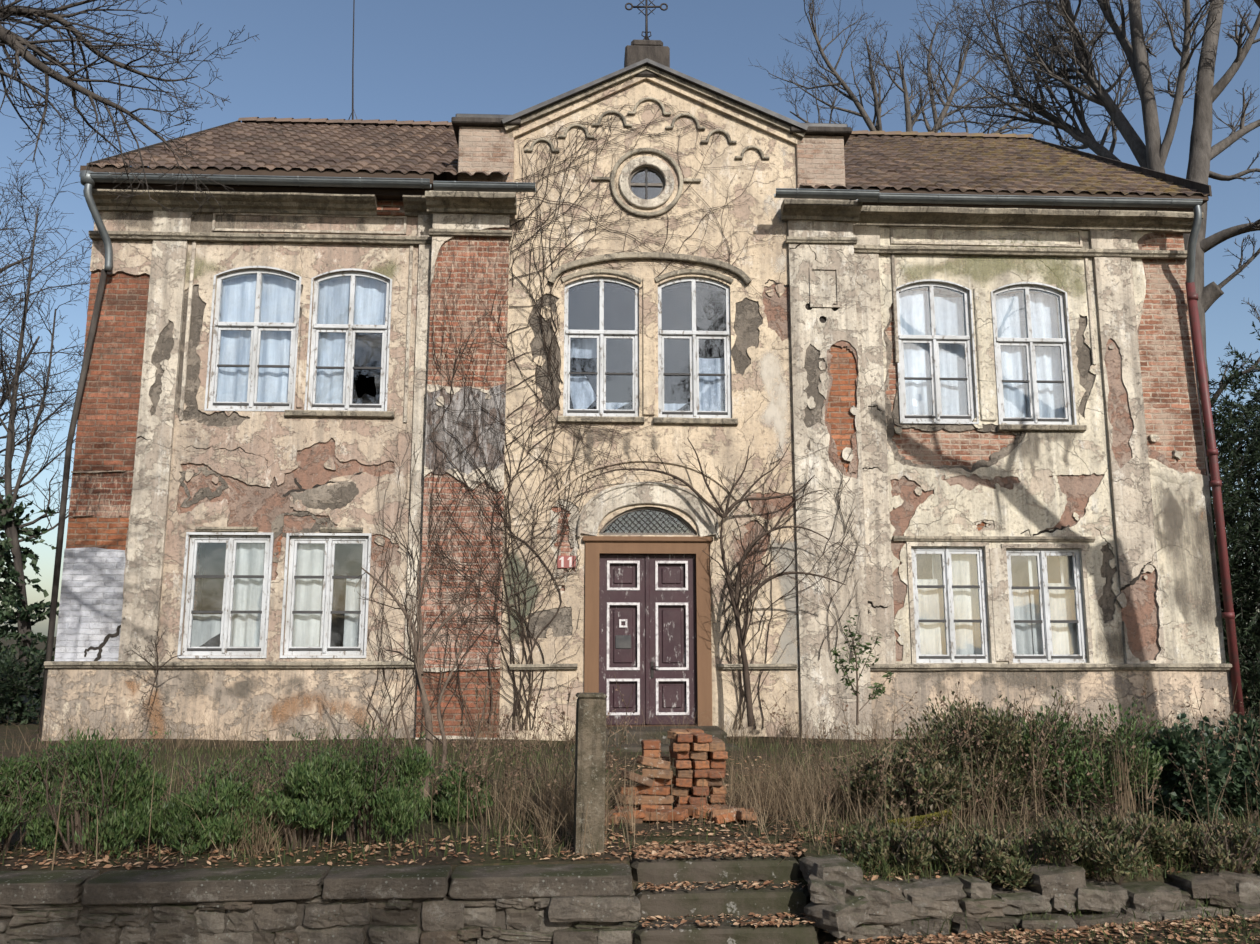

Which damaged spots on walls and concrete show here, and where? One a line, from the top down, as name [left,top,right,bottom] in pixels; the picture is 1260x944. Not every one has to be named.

flaking render [66,270,250,550]
spalling [528,294,561,411]
spalling [731,283,790,375]
flaking render [803,341,859,479]
flaking render [1076,232,1207,476]
spalling [177,438,395,580]
flaking render [416,228,509,738]
flaking render [883,303,1027,661]
spalling [1045,473,1104,530]
crack [84,625,121,661]
spalling [1098,542,1160,662]